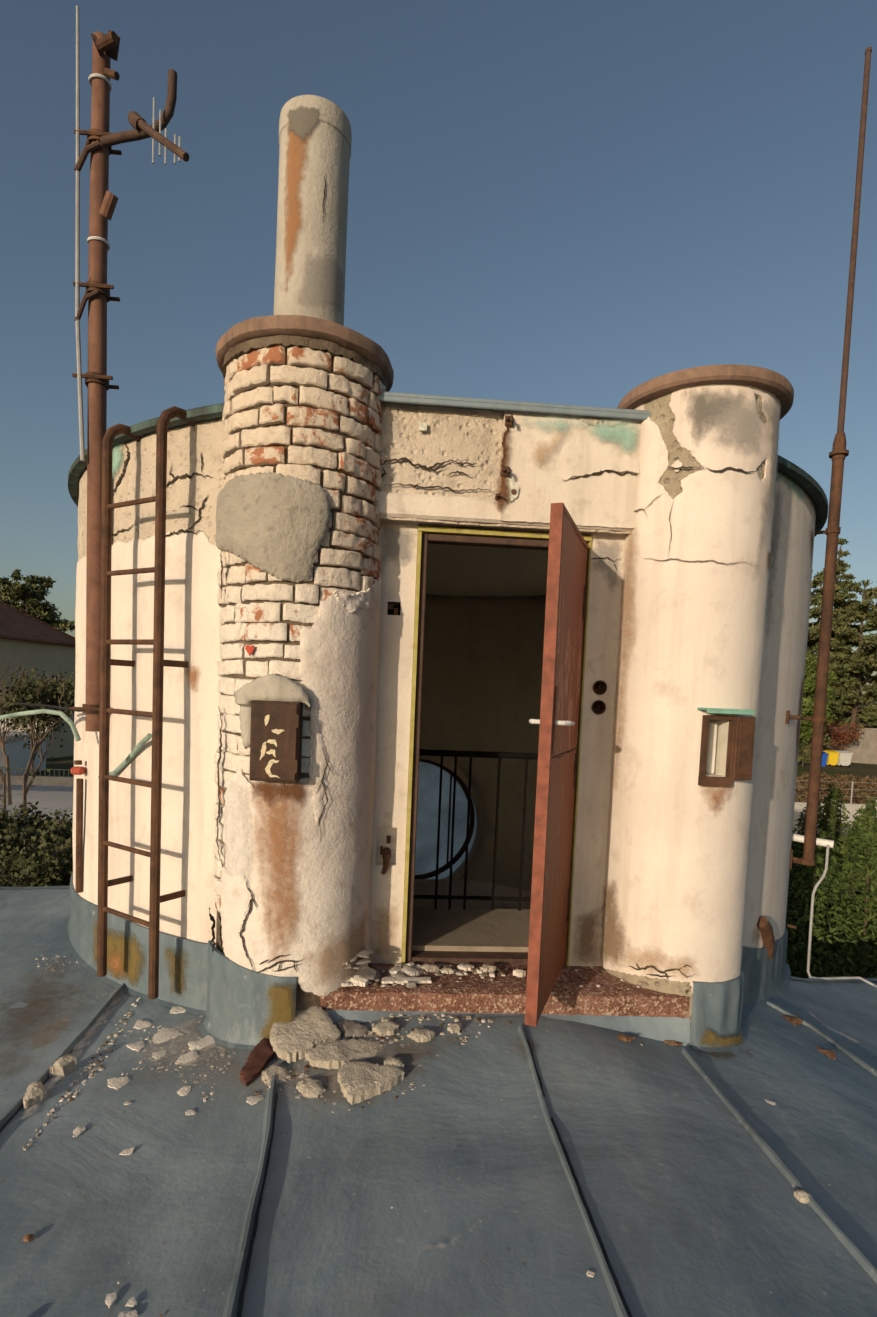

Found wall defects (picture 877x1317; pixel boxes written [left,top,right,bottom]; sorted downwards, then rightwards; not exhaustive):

rust [285,130,307,269]
flaking render [77,469,87,561]
flaking render [112,419,224,546]
rust [496,429,510,511]
crack [588,466,759,569]
crack [209,706,301,974]
rust [252,782,304,939]
crack [315,747,334,840]
water stain [579,887,622,962]